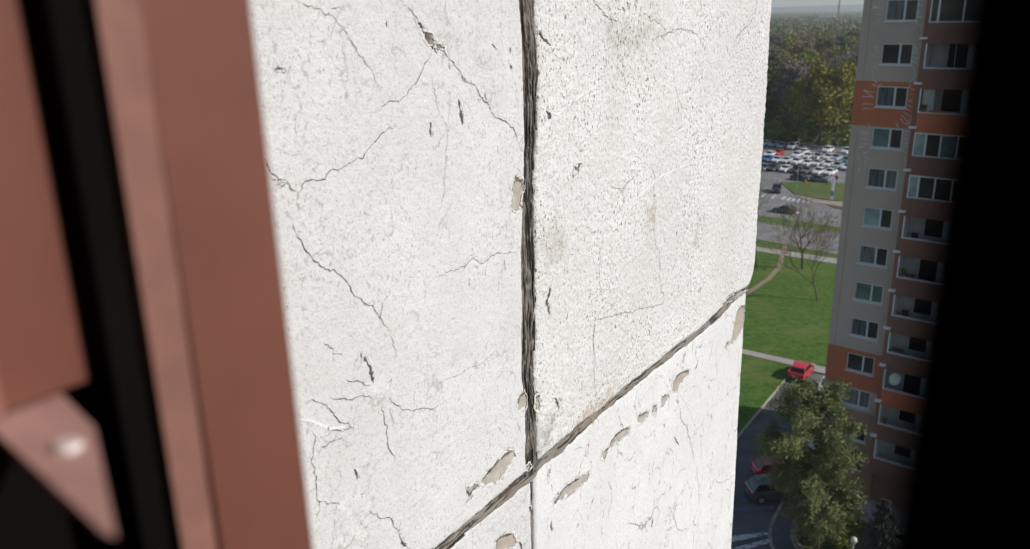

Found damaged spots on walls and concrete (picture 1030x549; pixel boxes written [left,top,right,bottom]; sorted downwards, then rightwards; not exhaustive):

peeling [510,174,525,214]
crack [269,1,526,549]
peeling [722,289,747,350]
peeling [551,360,699,529]
peeling [466,447,533,504]
peeling [494,531,524,549]